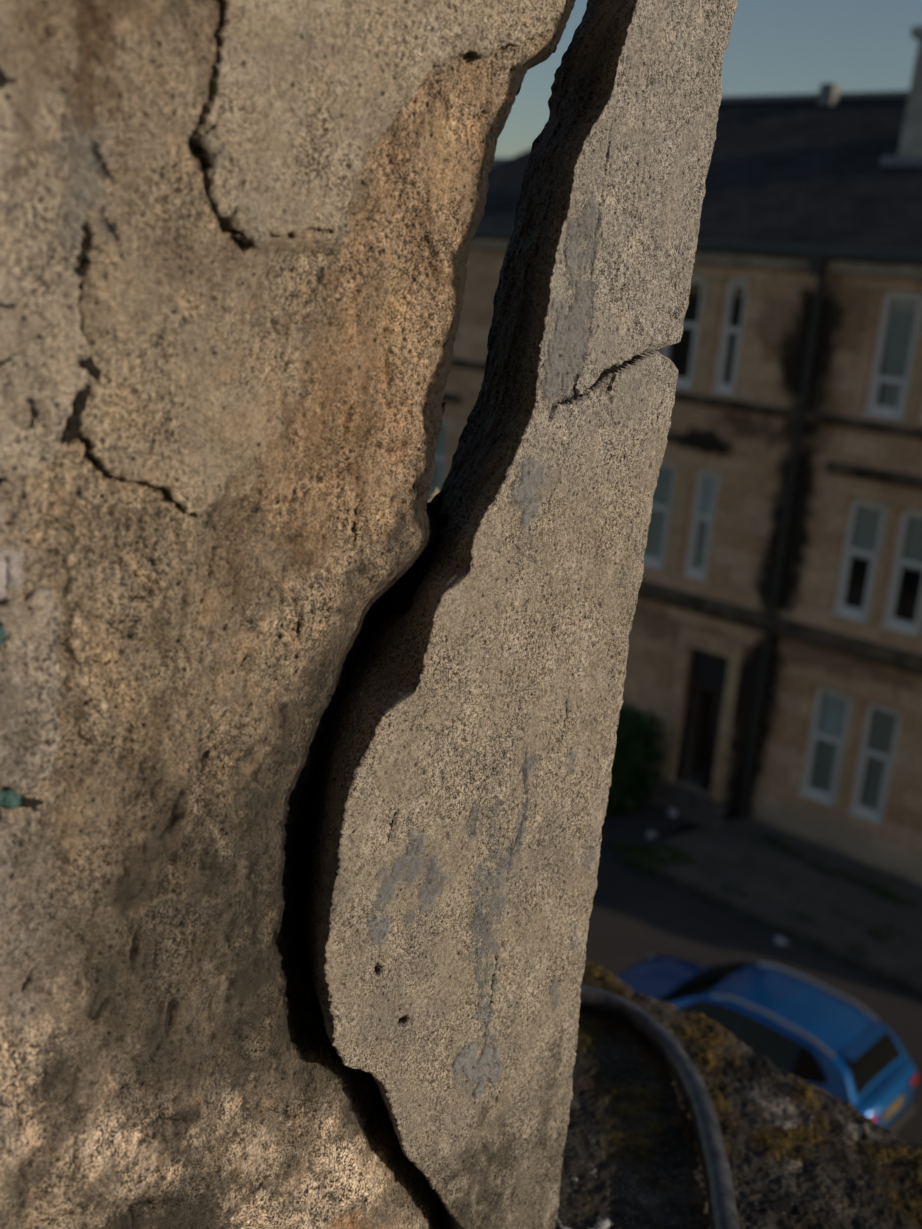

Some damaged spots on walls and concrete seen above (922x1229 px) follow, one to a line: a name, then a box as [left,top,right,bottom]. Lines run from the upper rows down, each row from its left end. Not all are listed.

crack [557,355,644,404]
flaking render [0,0,566,907]
leakage [754,281,844,616]
crack [350,506,358,547]
crack [506,747,527,879]
crack [482,957,497,1037]